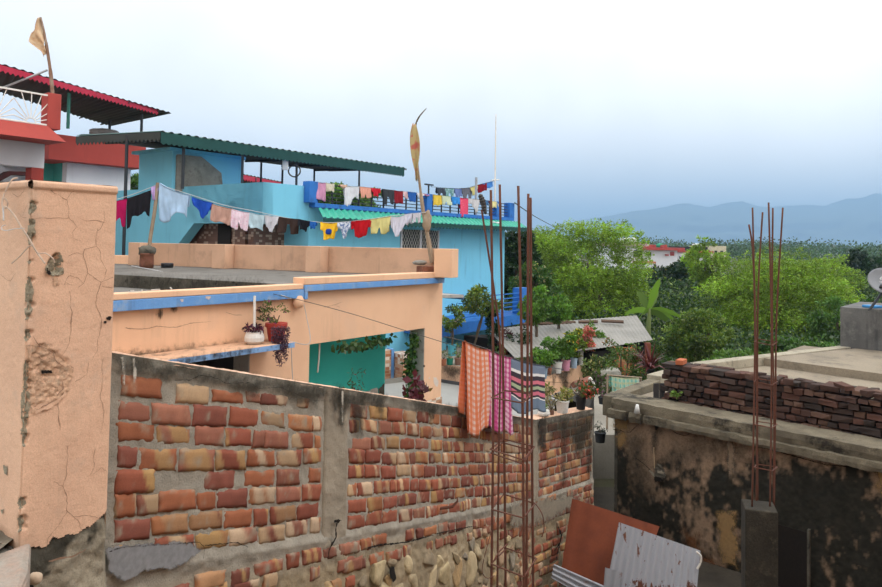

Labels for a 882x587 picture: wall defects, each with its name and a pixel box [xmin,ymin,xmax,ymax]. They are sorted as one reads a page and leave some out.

crack [15,185,113,429]
spalling [20,360,30,447]
spalling [17,497,26,533]
crack [46,447,100,562]
crack [110,541,245,559]